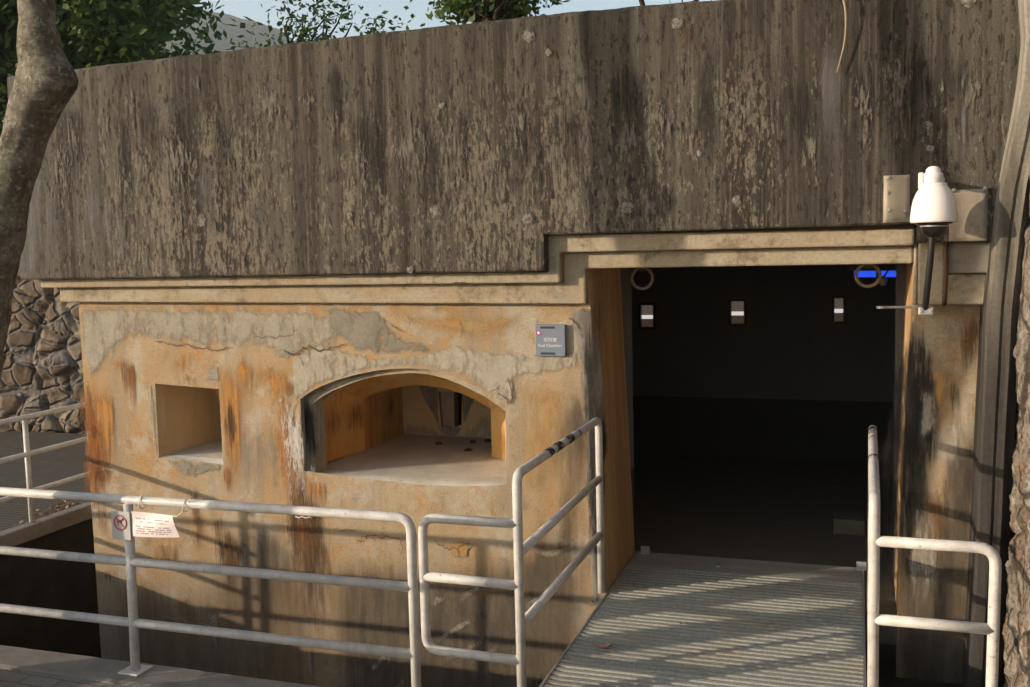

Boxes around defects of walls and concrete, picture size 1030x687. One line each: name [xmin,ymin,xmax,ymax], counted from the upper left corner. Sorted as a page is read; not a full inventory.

water stain [20,175,52,270]
corrosion [80,388,113,527]
corrosion [115,360,135,407]
crack [155,341,229,352]
corrosion [220,362,330,625]
crack [254,329,347,366]
peeling [81,308,598,605]
crack [341,529,404,554]
water stain [563,299,607,554]
water stain [878,335,974,684]